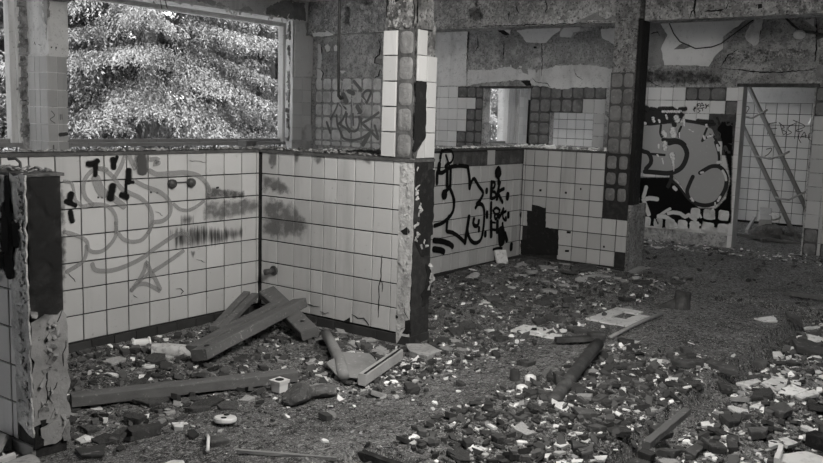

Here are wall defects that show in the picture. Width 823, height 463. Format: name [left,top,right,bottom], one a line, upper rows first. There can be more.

crack [690,0,729,17]
crack [720,50,815,73]
peeling [453,7,635,202]
peeling [644,87,737,171]
peeling [388,0,429,344]
peeling [520,205,571,255]
peeling [9,173,71,450]